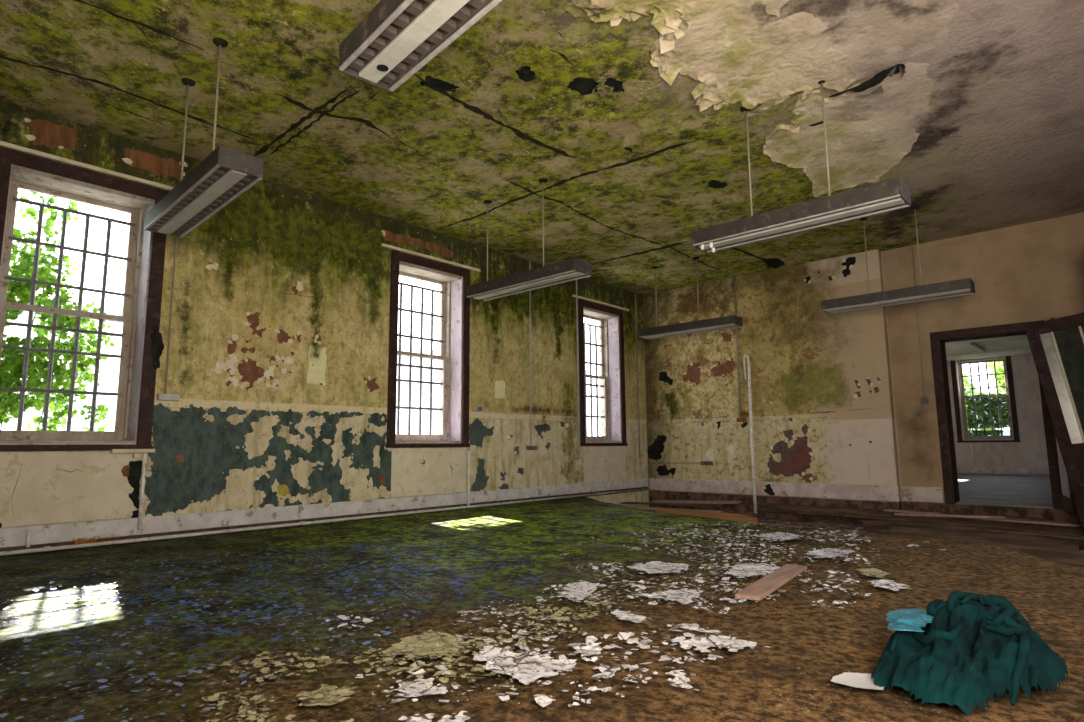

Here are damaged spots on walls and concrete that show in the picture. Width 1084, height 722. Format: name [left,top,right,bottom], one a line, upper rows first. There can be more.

damp [420,76,459,92]
damp [515,66,536,82]
damp [568,77,625,95]
peeling [562,0,962,197]
damp [904,45,1015,157]
crack [414,74,776,272]
damp [708,180,728,189]
peeling [215,312,322,391]
flaking render [683,357,735,385]
peeling [121,403,398,521]
peeling [469,418,524,492]
flaking render [762,417,813,495]